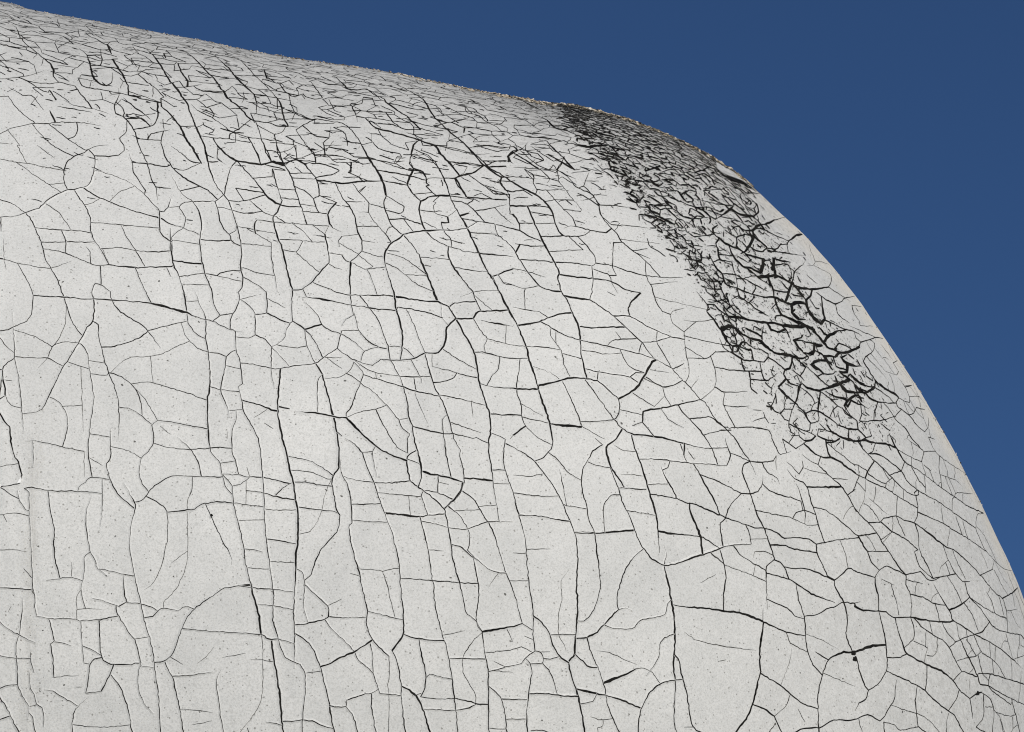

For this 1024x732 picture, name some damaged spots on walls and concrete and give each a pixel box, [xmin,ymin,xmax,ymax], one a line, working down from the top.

crack [938,455,984,519]
crack [0,598,46,732]
crack [215,669,225,732]